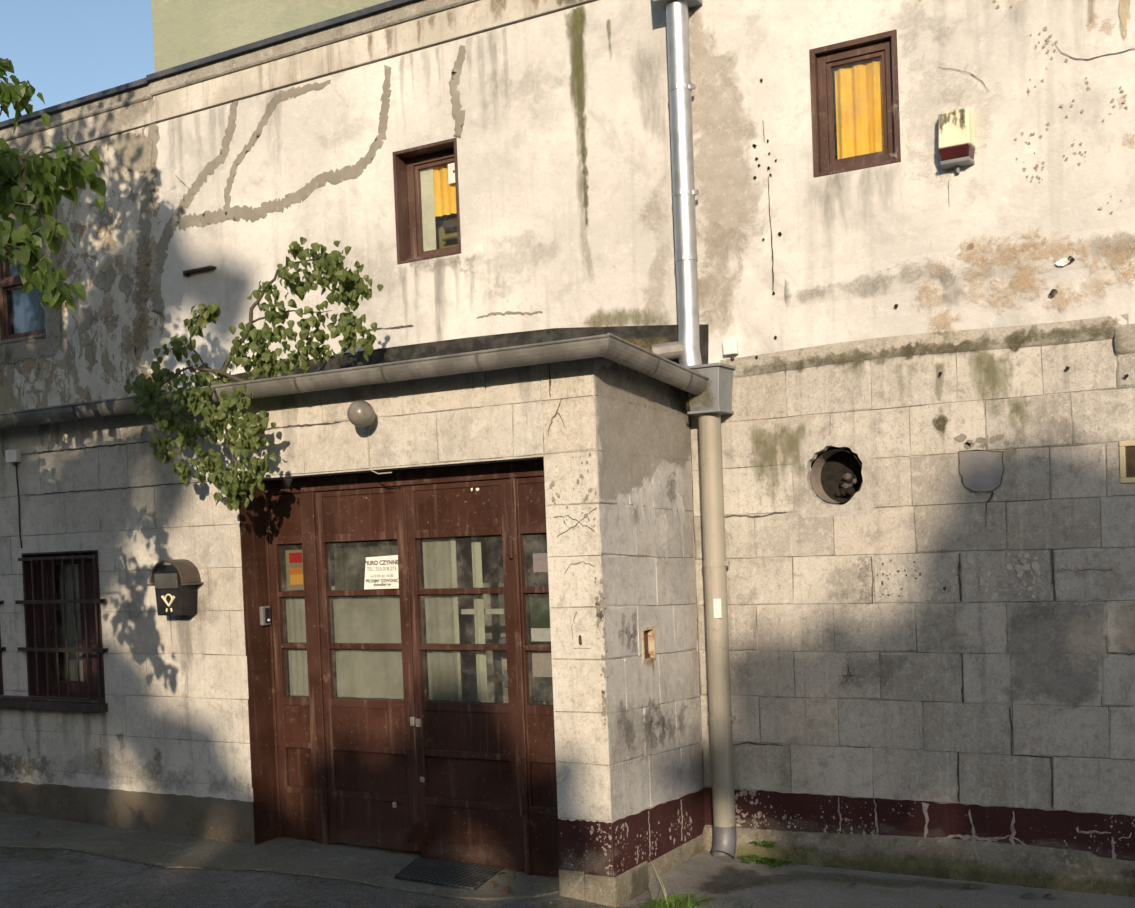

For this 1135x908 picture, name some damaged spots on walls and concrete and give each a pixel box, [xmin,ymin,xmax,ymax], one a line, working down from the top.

crack [1056,46,1131,60]
leakage [568,8,588,224]
leakage [689,13,757,258]
flaking render [1055,255,1075,266]
flaking render [60,236,153,354]
mould [0,754,54,782]
peeling [568,800,693,874]
peeling [735,788,1034,845]
peeling [1055,816,1135,859]